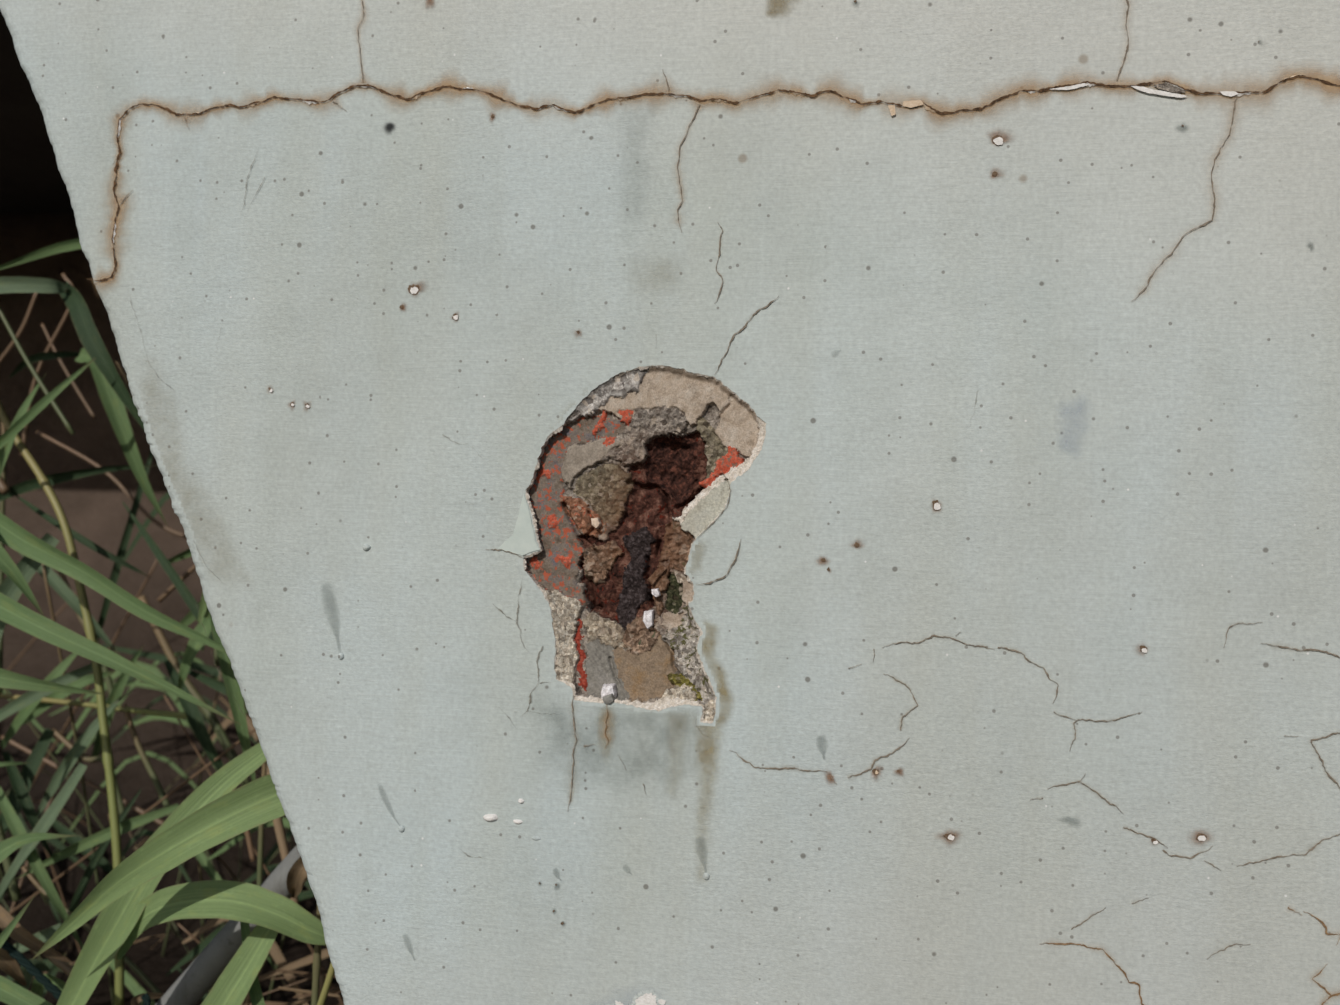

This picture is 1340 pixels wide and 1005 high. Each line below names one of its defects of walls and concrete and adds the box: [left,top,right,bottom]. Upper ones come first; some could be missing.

crack [87,0,1340,304]
crack [714,296,779,375]
spalling [498,365,766,724]
crack [1224,622,1340,658]
crack [696,632,1340,870]
peeling [605,989,666,1005]
crack [1043,898,1146,1005]
crack [1288,907,1340,1005]